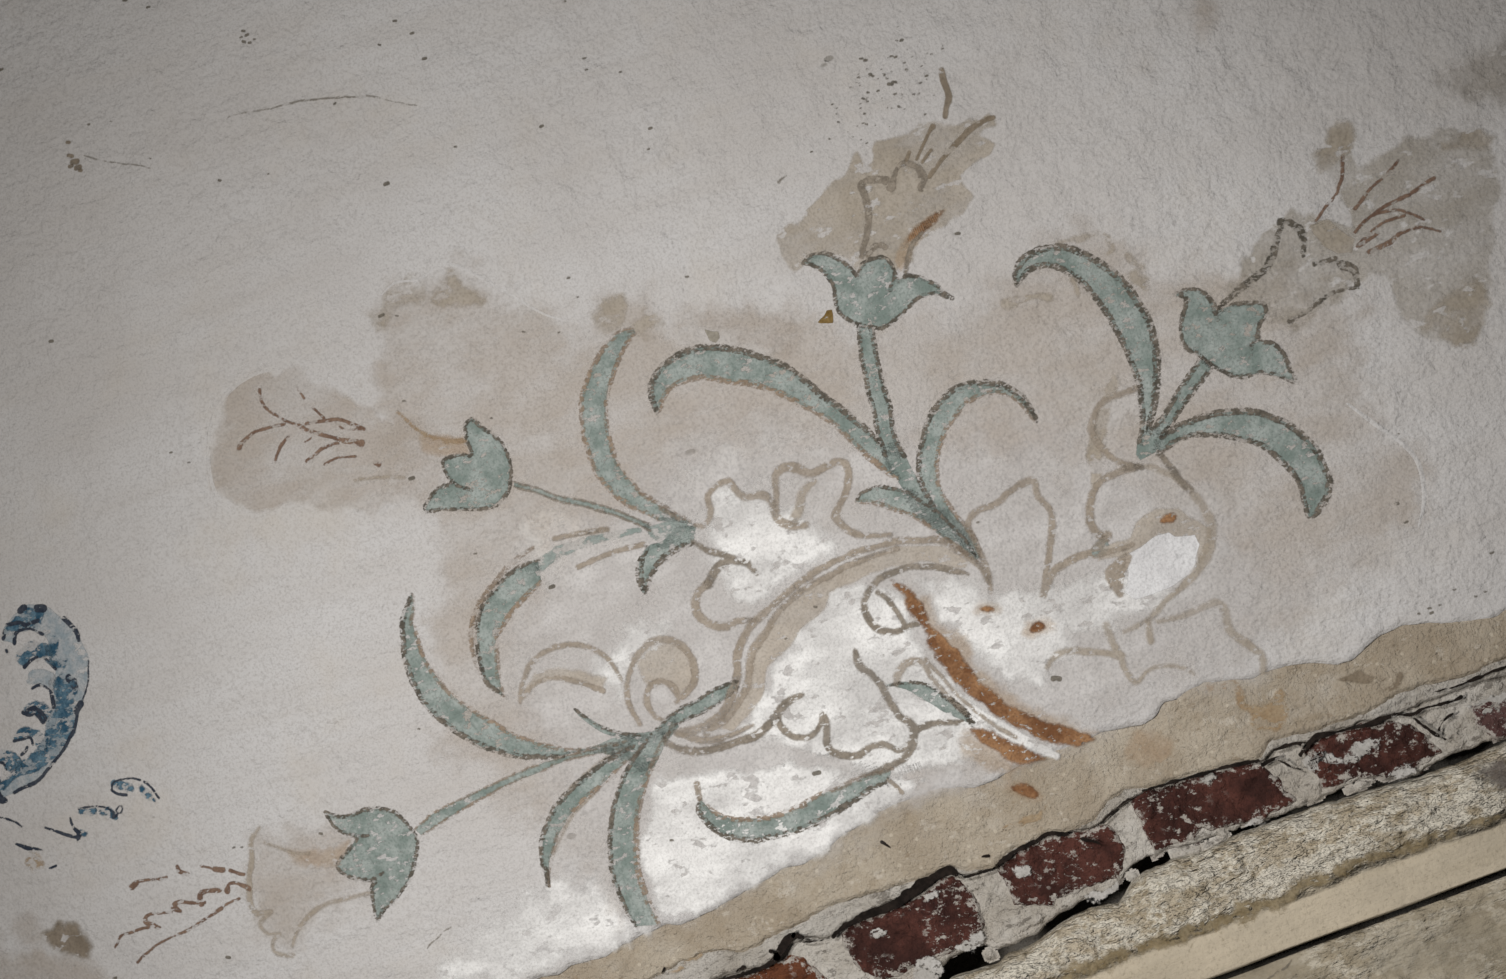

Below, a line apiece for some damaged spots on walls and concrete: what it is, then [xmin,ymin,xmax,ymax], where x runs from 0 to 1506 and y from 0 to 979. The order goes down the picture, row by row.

damp [785,115,994,270]
damp [1319,123,1353,156]
spalling [438,403,1506,979]
crack [721,666,1506,979]